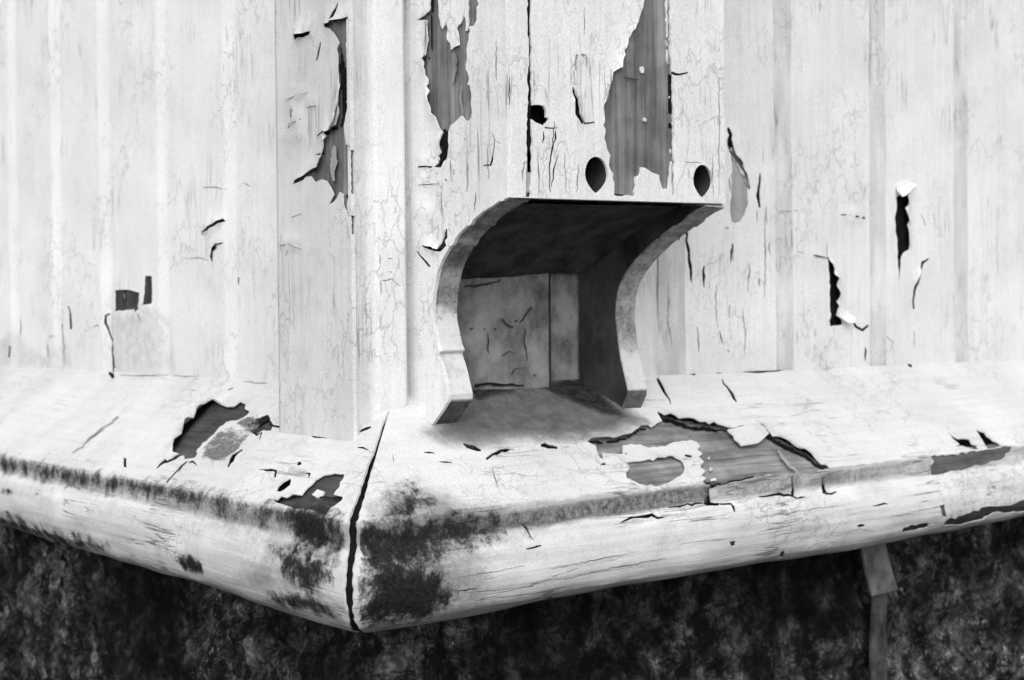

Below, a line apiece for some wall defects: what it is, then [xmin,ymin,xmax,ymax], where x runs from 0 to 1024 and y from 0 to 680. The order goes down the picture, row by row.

peeling [294,15,353,234]
peeling [419,0,478,168]
peeling [604,0,674,195]
water stain [0,457,344,619]
peeling [158,402,272,482]
crack [255,415,279,428]
peeling [275,471,344,514]
crack [345,413,394,631]
crack [424,445,507,486]
water stain [358,482,708,628]
peeling [588,412,828,486]
peeling [931,435,1011,475]